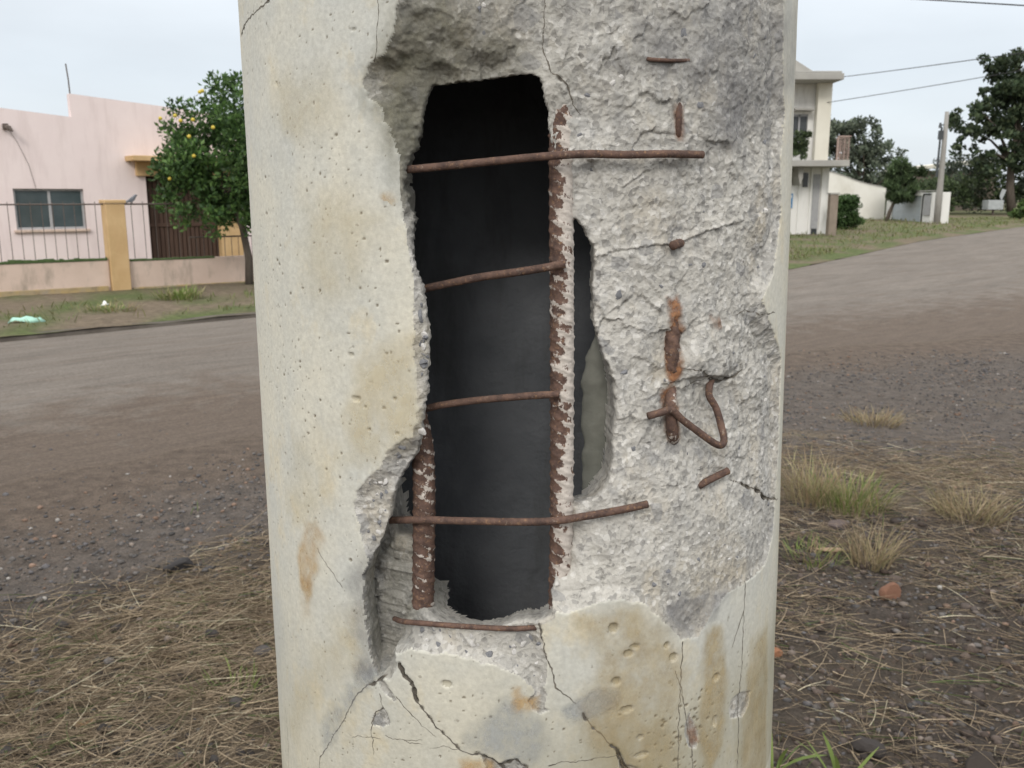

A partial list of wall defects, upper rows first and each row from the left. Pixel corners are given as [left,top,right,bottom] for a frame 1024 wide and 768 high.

spalling [354,0,785,727]
corrosion [661,343,683,431]
corrosion [668,297,684,333]
crack [319,623,628,768]
crack [675,642,693,768]
crack [732,581,746,764]